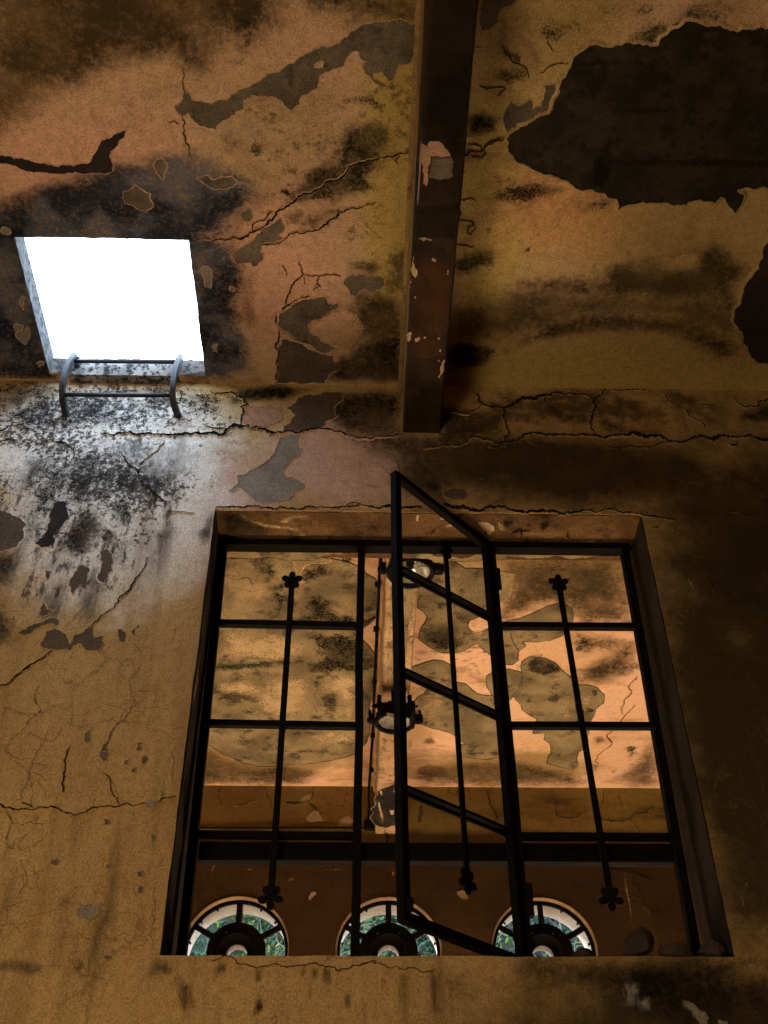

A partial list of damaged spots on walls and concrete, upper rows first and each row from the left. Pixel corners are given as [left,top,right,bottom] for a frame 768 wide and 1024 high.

flaking render [0,127,128,175]
flaking render [173,18,415,130]
flaking render [500,16,768,216]
crack [204,150,409,384]
mould [456,252,492,273]
water stain [0,554,18,582]
flaking render [0,500,70,553]
water stain [0,380,220,553]
flaking render [227,273,386,504]
crack [87,347,768,562]
water stain [448,343,492,370]
crack [0,640,176,933]